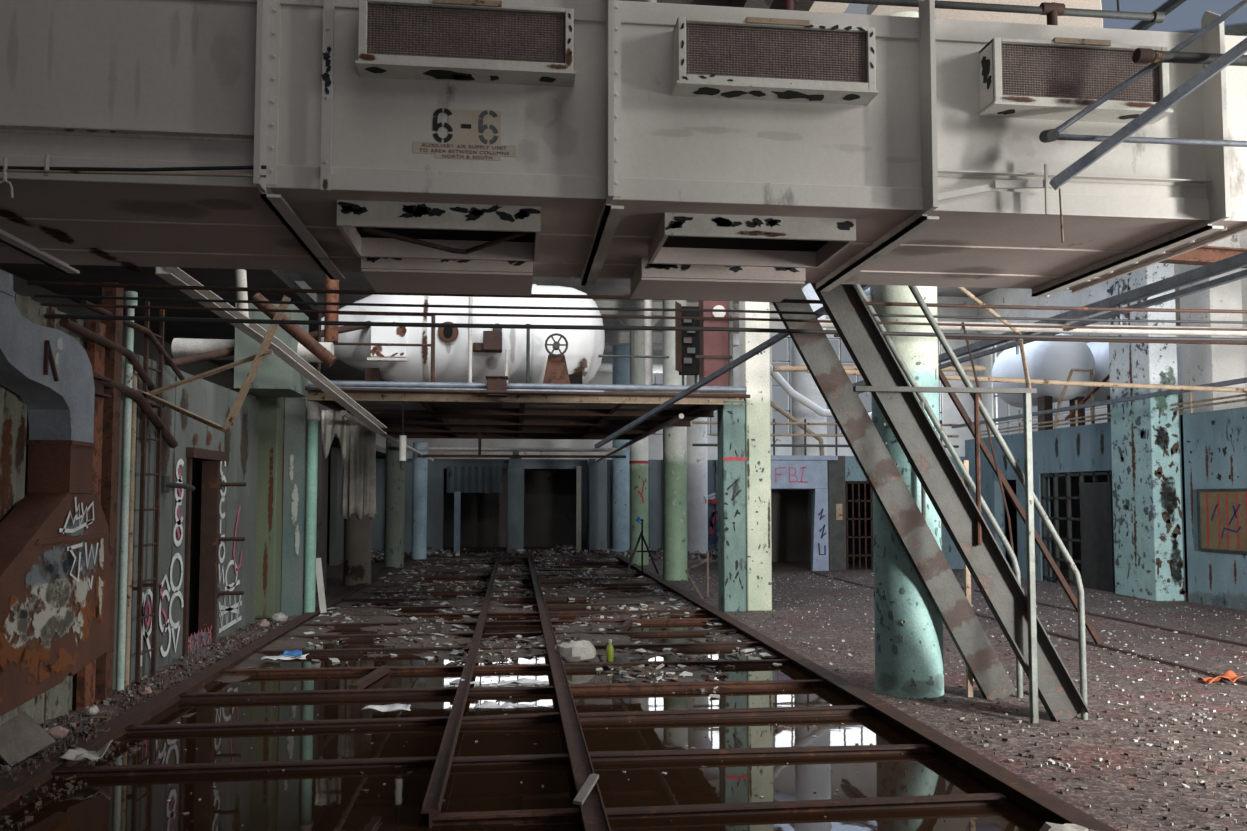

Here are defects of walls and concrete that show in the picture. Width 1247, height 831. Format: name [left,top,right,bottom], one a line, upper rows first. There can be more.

peeling [805,25,874,68]
peeling [680,23,824,101]
peeling [423,70,475,81]
peeling [337,202,368,215]
peeling [397,203,541,222]
peeling [665,216,694,230]
peeling [712,217,781,228]
peeling [837,221,854,230]
peeling [1113,404,1192,596]
peeling [725,545,772,598]
rust [0,562,106,684]